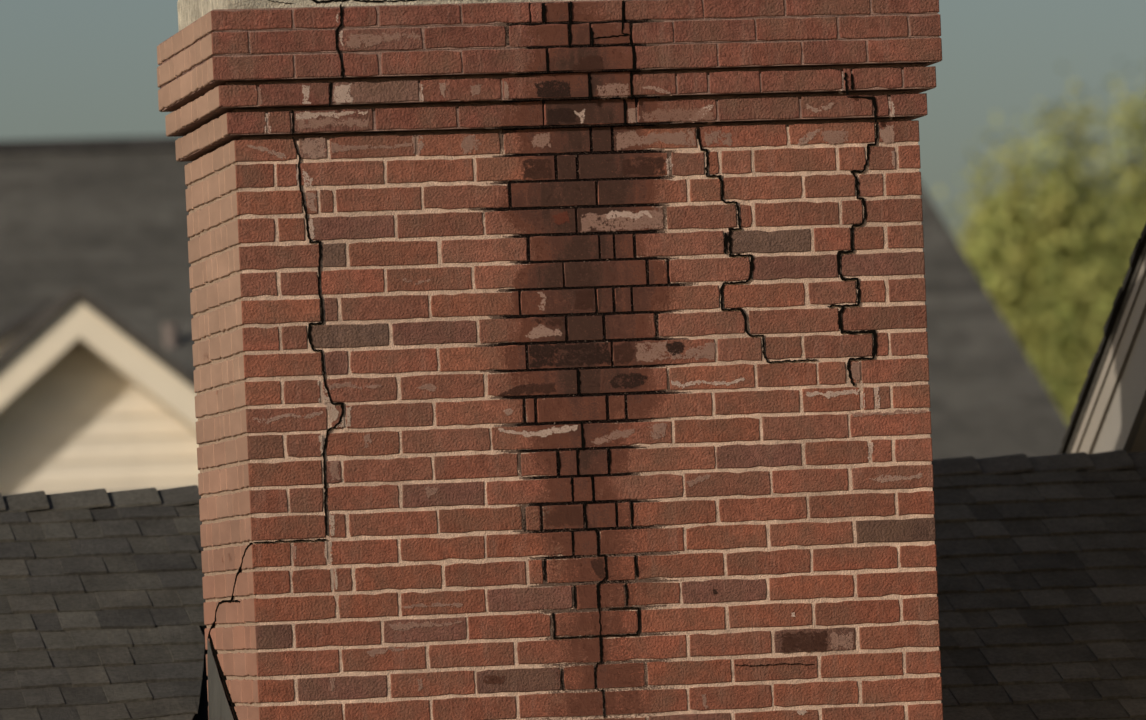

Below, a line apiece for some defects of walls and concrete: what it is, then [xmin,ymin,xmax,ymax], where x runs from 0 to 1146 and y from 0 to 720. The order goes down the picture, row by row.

crack [269,0,416,107]
crack [542,1,636,127]
crack [208,110,344,639]
damp [461,0,745,720]
crack [696,127,817,363]
crack [827,72,878,386]
crack [552,370,640,718]